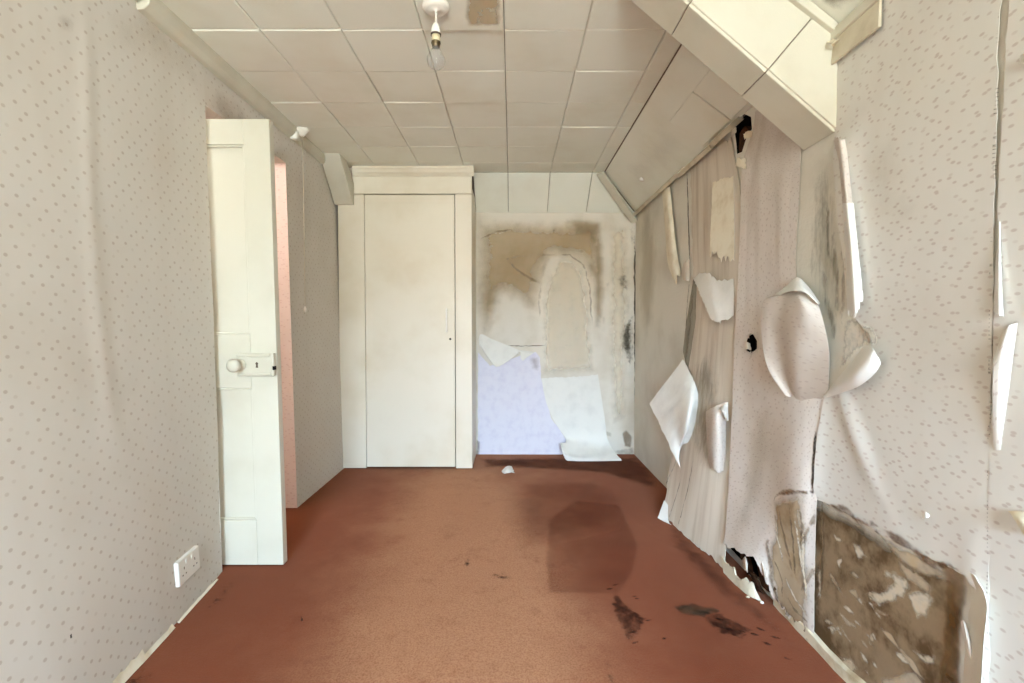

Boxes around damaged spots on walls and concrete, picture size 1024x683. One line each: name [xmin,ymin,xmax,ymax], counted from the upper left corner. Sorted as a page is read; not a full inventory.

spalling [731,115,753,169]
flaking render [683,280,696,367]
spalling [721,548,776,604]